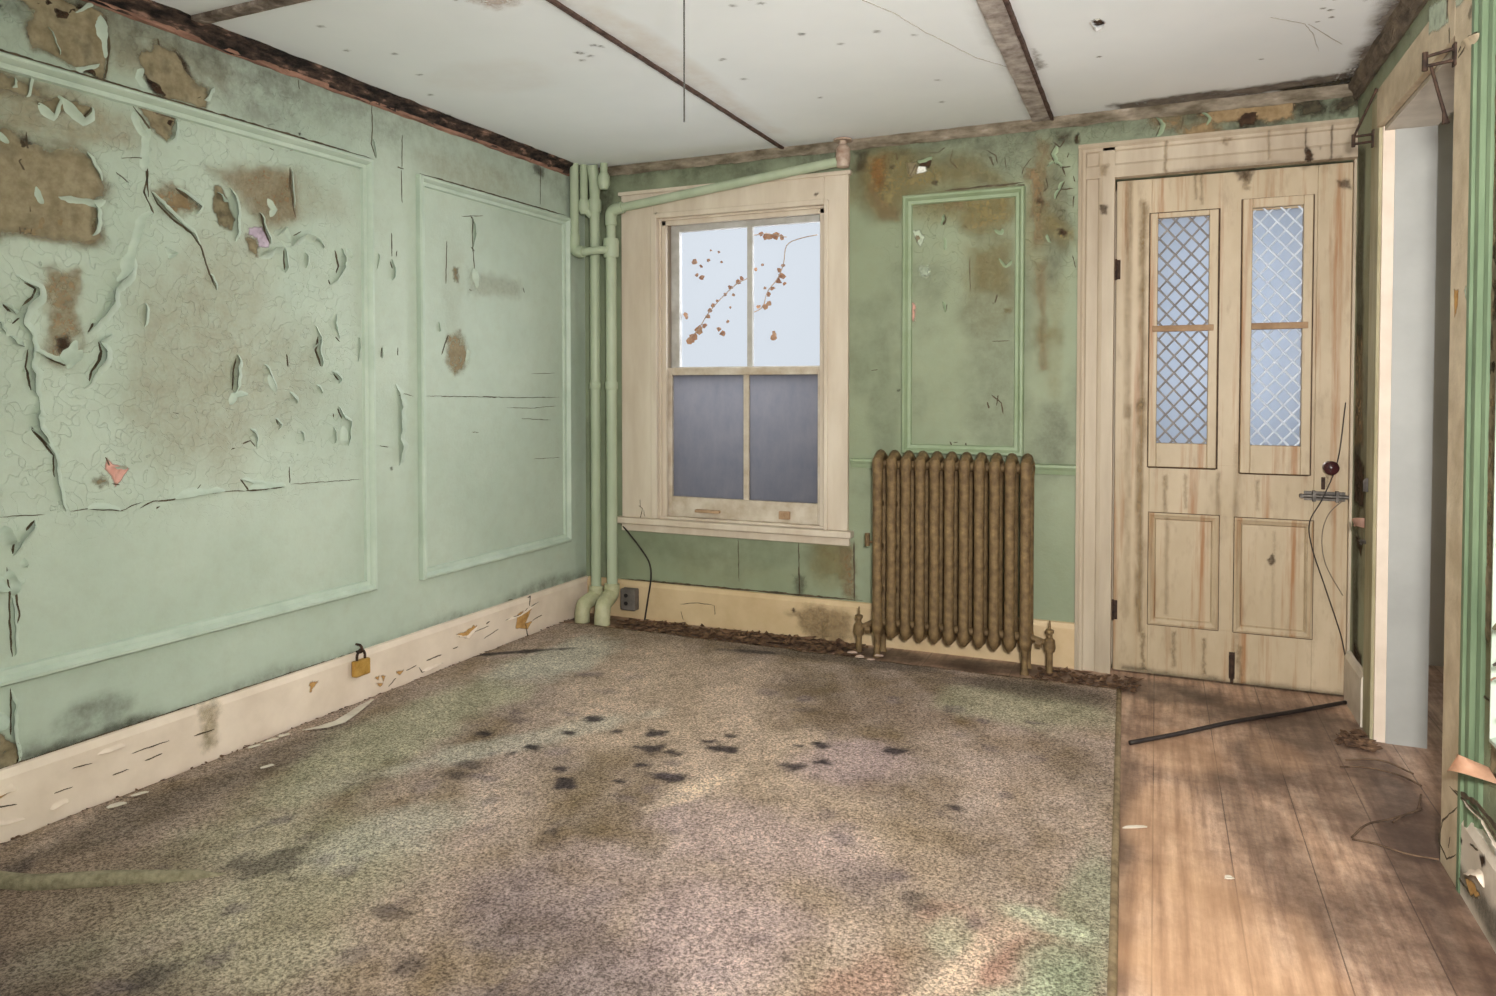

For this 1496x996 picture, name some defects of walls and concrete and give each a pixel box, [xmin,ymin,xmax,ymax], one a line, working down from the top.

peeling [0,71,95,126]
peeling [21,0,111,79]
peeling [131,39,215,145]
water stain [1116,0,1400,137]
peeling [0,126,107,245]
peeling [157,168,353,286]
water stain [859,152,1024,232]
peeling [0,258,138,512]
peeling [229,355,248,405]
peeling [439,323,471,373]
peeling [375,596,542,687]
peeling [0,689,25,826]